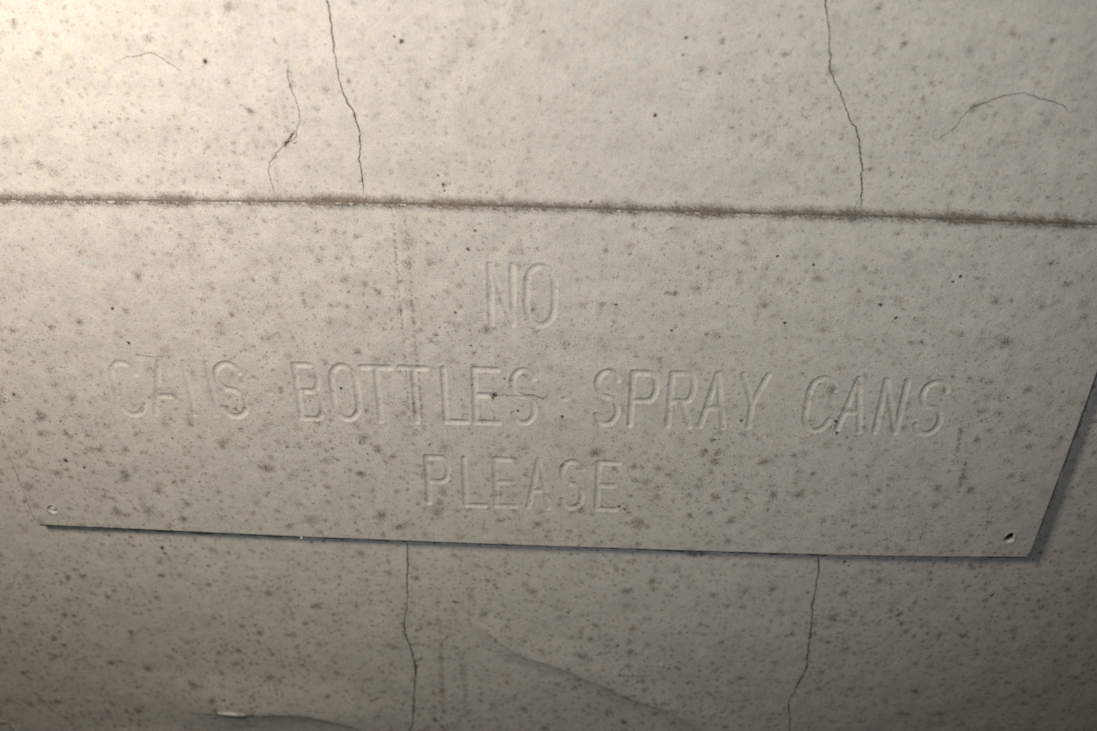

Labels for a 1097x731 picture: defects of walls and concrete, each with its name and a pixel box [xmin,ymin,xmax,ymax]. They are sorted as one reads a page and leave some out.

crack [326,1,363,185]
crack [825,0,863,201]
crack [403,550,417,729]
crack [788,557,819,731]